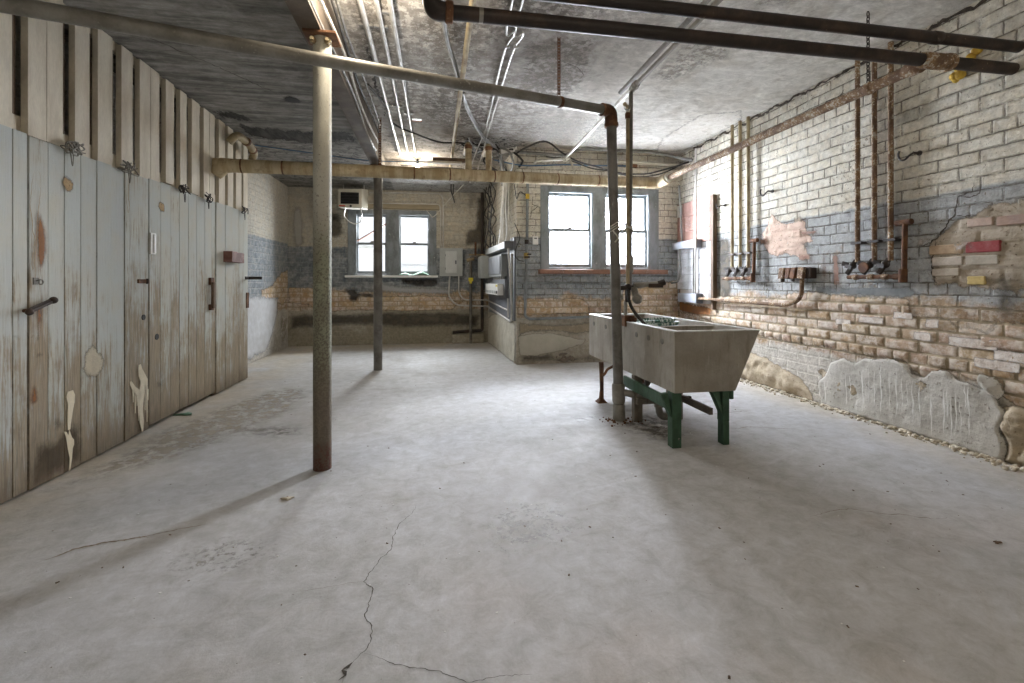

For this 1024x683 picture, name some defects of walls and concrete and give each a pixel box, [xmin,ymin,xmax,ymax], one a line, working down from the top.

rust [37,218,46,266]
peeling [760,214,816,261]
peeling [919,199,1024,294]
peeling [621,280,1024,472]
crack [42,524,205,561]
crack [306,507,531,682]